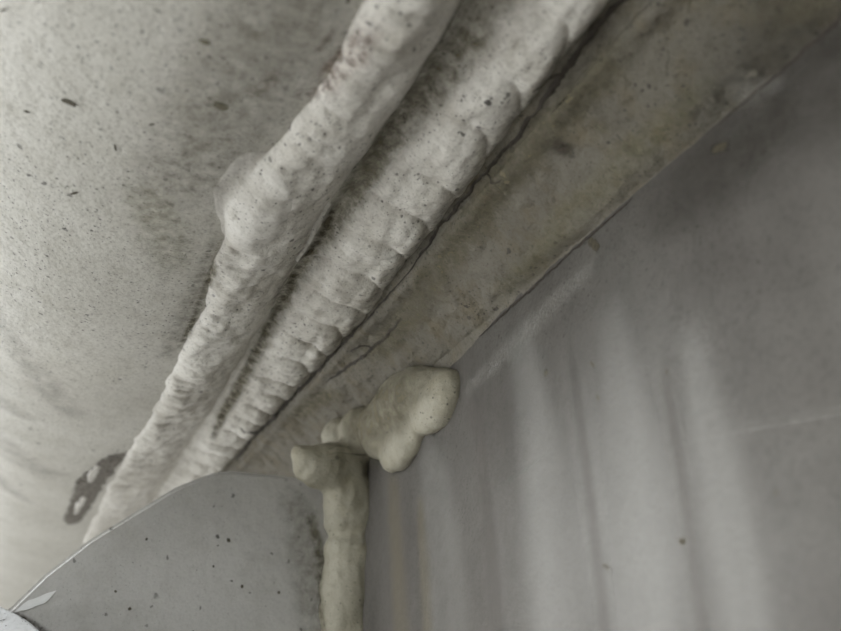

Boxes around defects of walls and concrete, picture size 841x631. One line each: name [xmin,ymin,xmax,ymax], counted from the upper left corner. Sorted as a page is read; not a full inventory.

crack [235,0,632,461]
spalling [62,453,126,525]